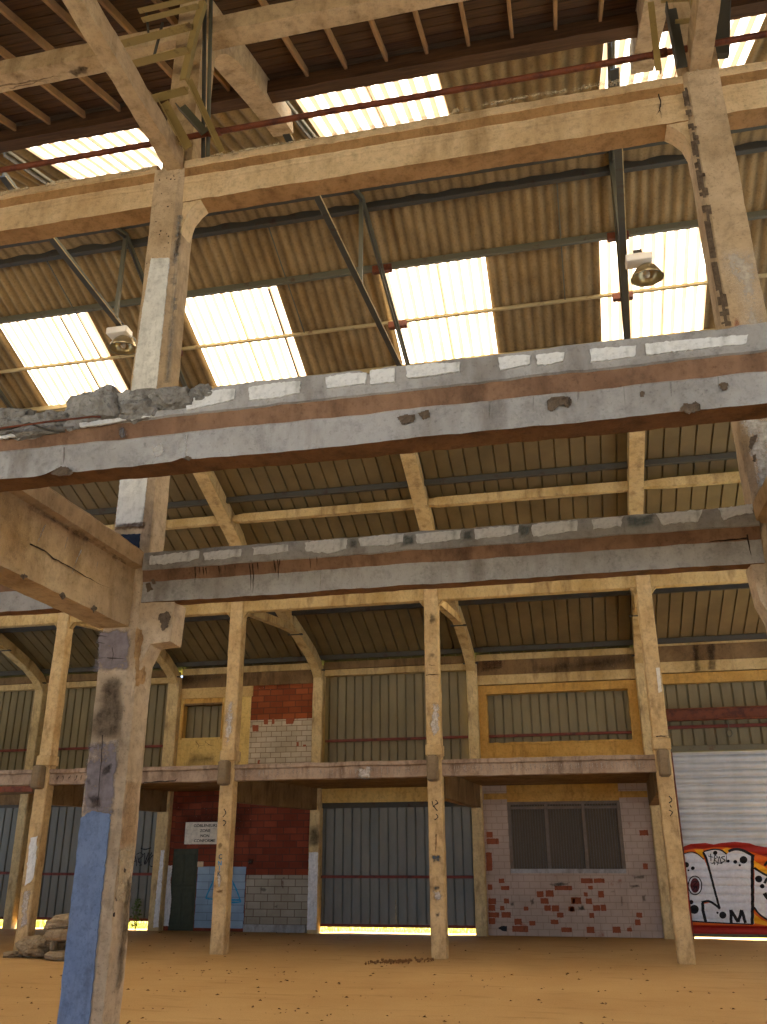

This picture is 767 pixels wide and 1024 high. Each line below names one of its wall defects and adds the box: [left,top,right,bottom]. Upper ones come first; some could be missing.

peeling [590,87,756,363]
spalling [0,221,301,441]
peeling [325,362,460,389]
peeling [498,352,564,371]
spalling [397,410,430,425]
spalling [547,396,572,411]
peeling [115,478,148,527]
crack [30,543,106,587]
spalling [158,611,171,631]
damp [56,630,130,814]
flaking render [486,832,536,932]
flaking render [537,878,606,933]